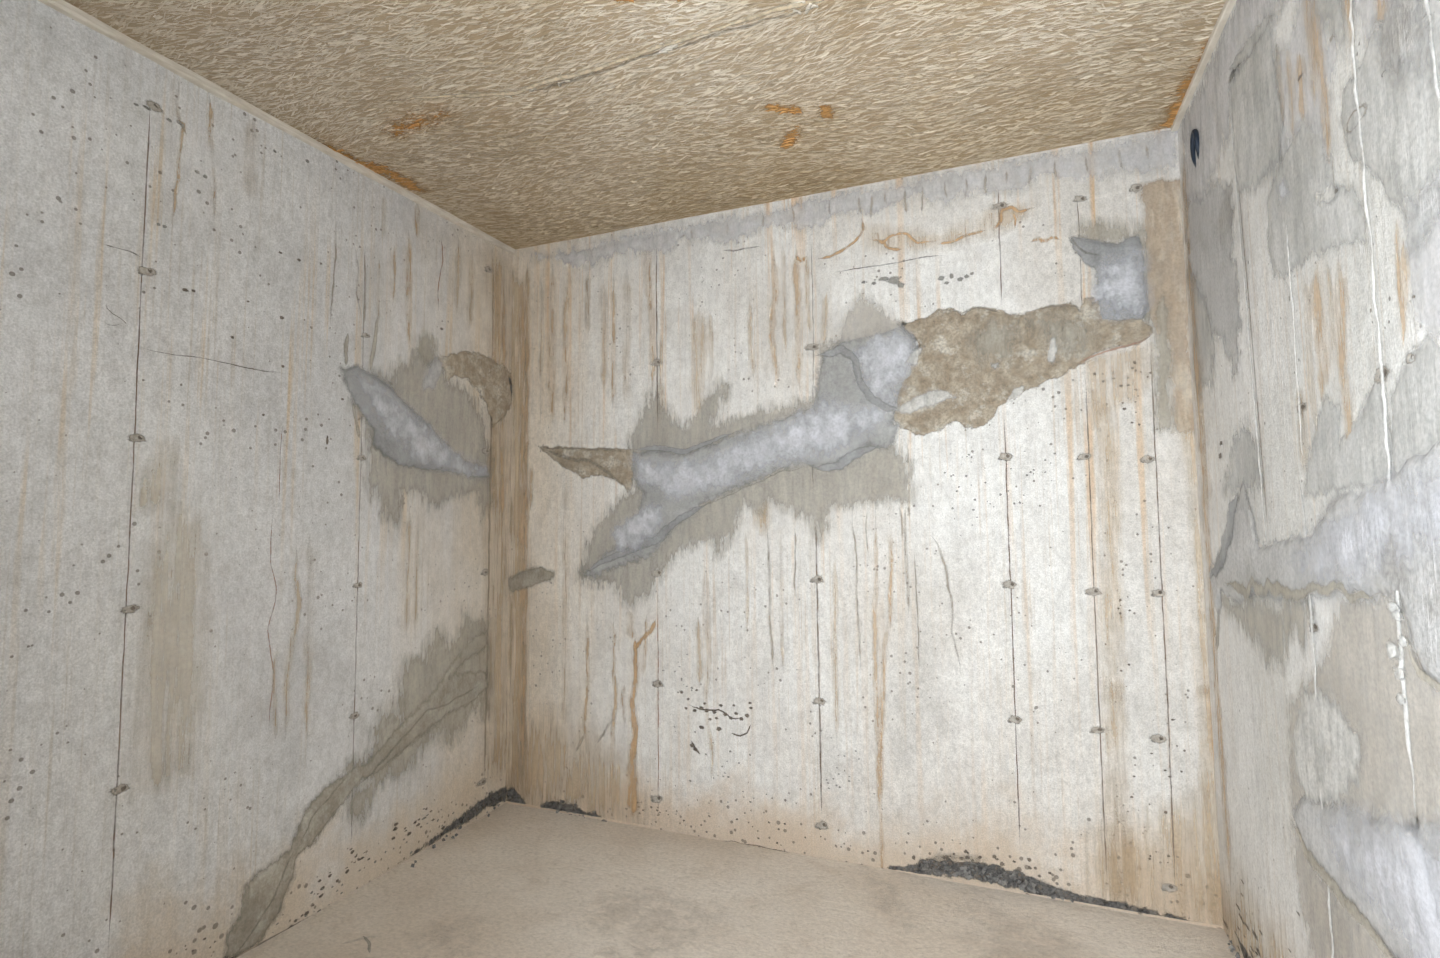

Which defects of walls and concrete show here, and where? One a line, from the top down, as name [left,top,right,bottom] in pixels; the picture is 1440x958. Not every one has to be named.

spalling [423,351,512,426]
spalling [894,297,1152,436]
water stain [225,617,492,958]
rust [613,622,655,812]
water stain [1209,440,1440,958]